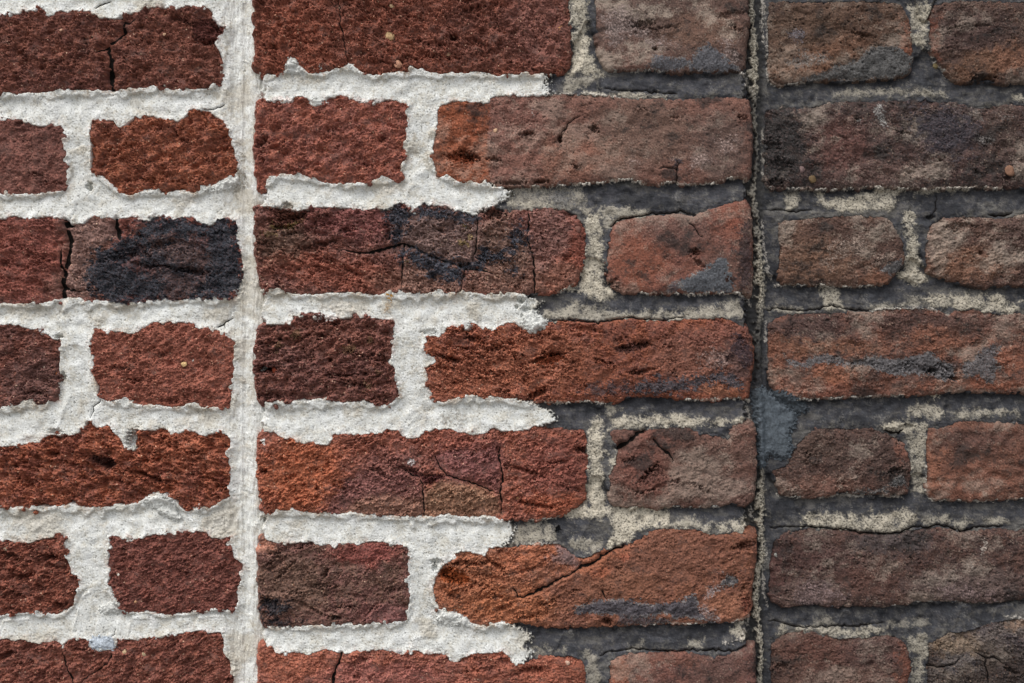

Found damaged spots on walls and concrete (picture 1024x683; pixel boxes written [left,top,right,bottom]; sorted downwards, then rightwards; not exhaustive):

crack [95,2,135,92]
crack [337,220,493,289]
crack [527,213,536,293]
crack [404,447,504,515]
crack [513,545,624,598]